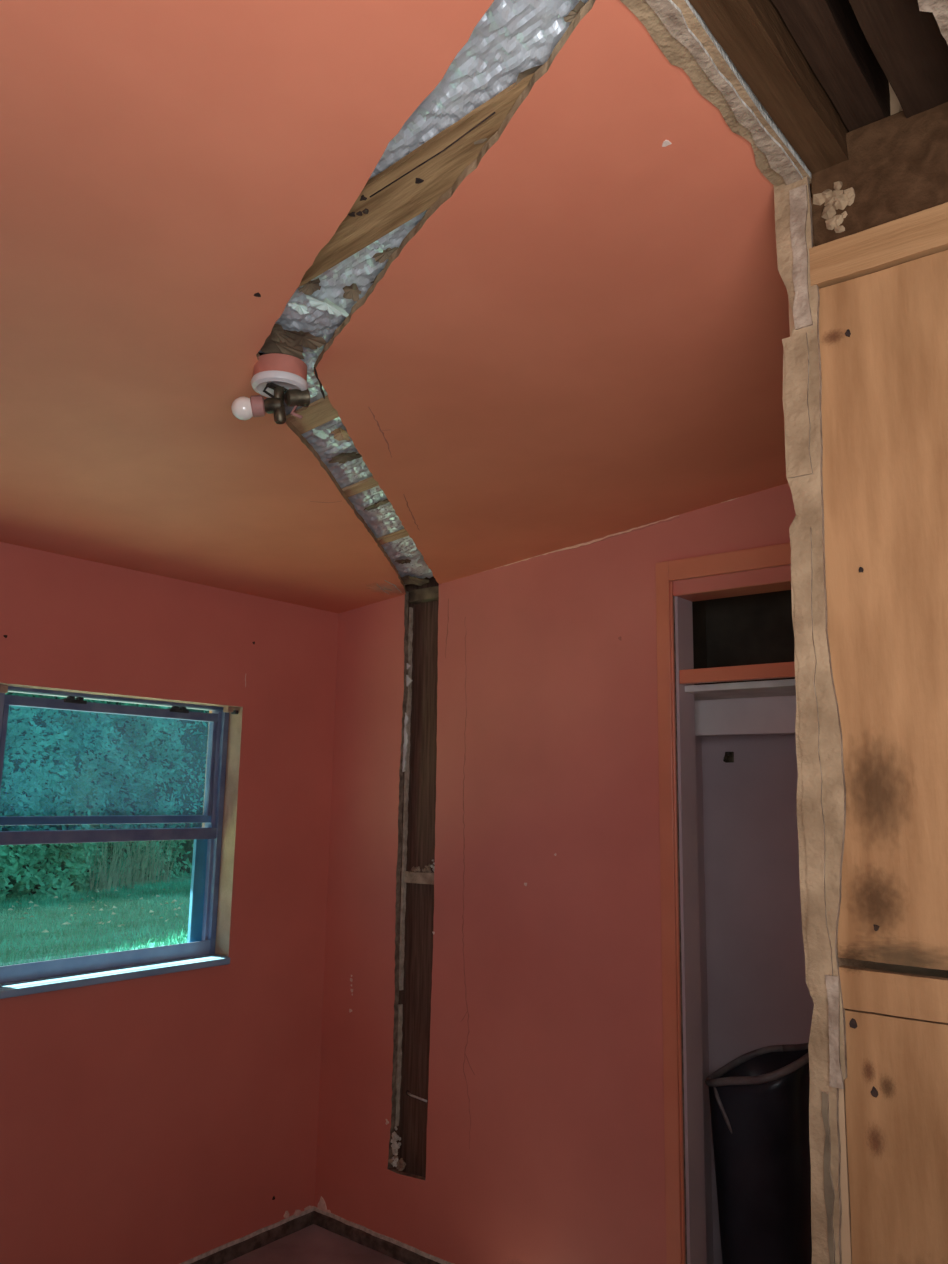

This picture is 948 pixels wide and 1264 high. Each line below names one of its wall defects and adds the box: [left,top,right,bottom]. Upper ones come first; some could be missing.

spalling [620,0,847,1264]